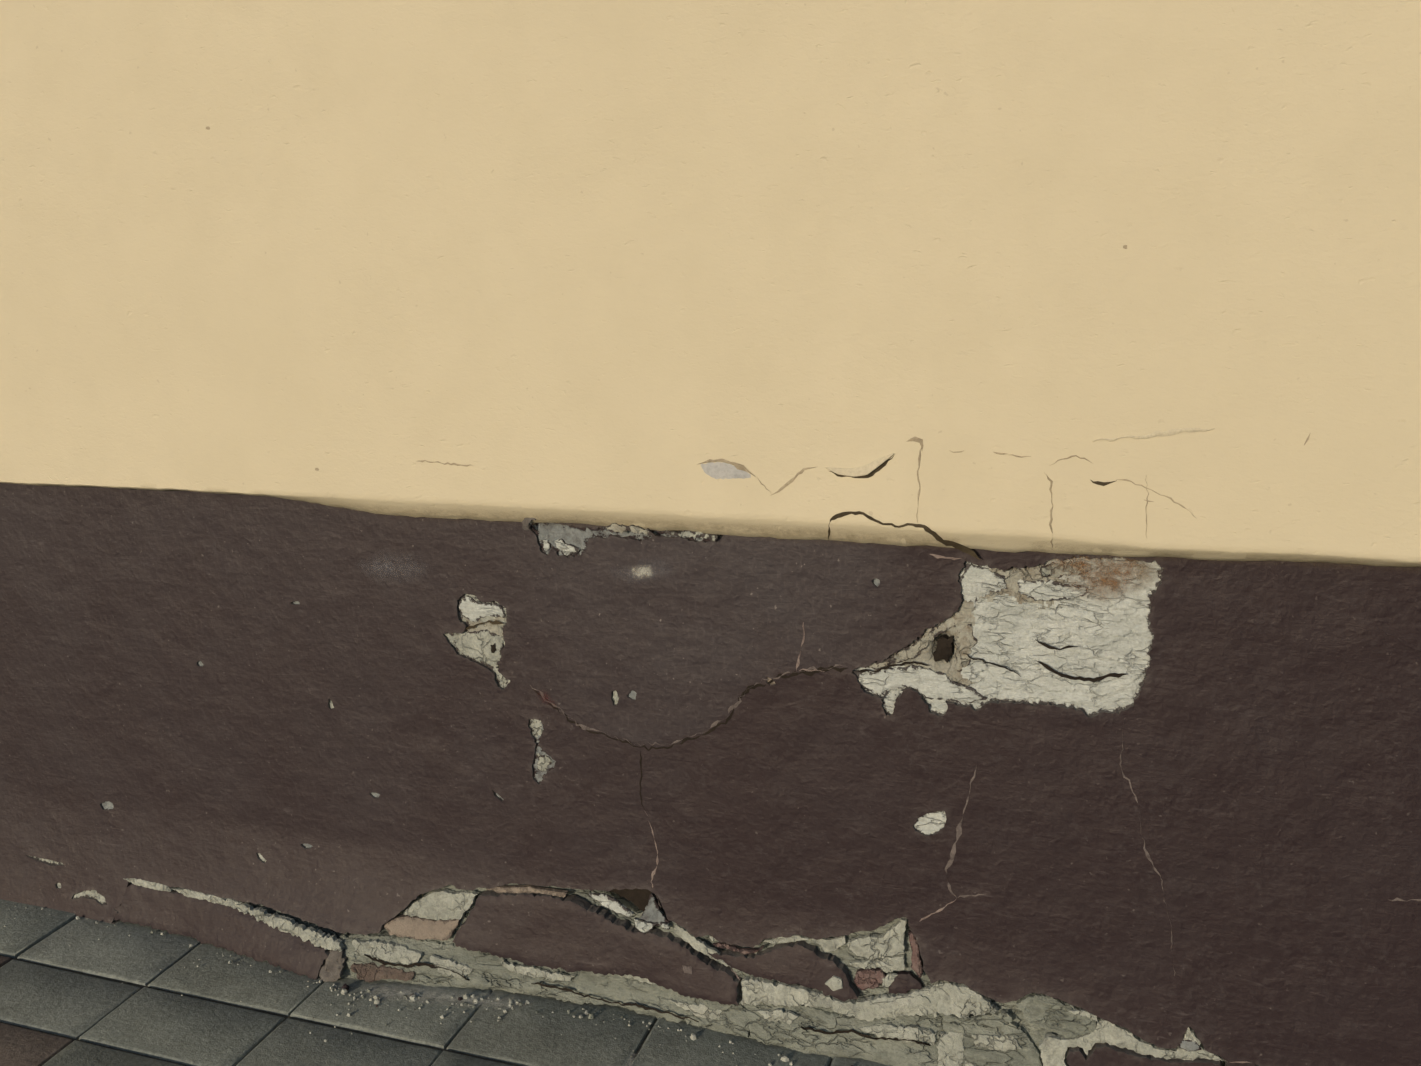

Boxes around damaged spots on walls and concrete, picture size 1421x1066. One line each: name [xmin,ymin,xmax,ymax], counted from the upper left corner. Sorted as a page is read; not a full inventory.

peeling [521,517,723,557]
crack [758,467,815,496]
crack [828,437,1196,560]
peeling [445,594,510,688]
peeling [853,556,1163,716]
peeling [529,719,556,784]
crack [530,622,860,1001]
peeling [913,811,946,835]
crack [920,765,984,921]
spalling [241,883,1225,1066]